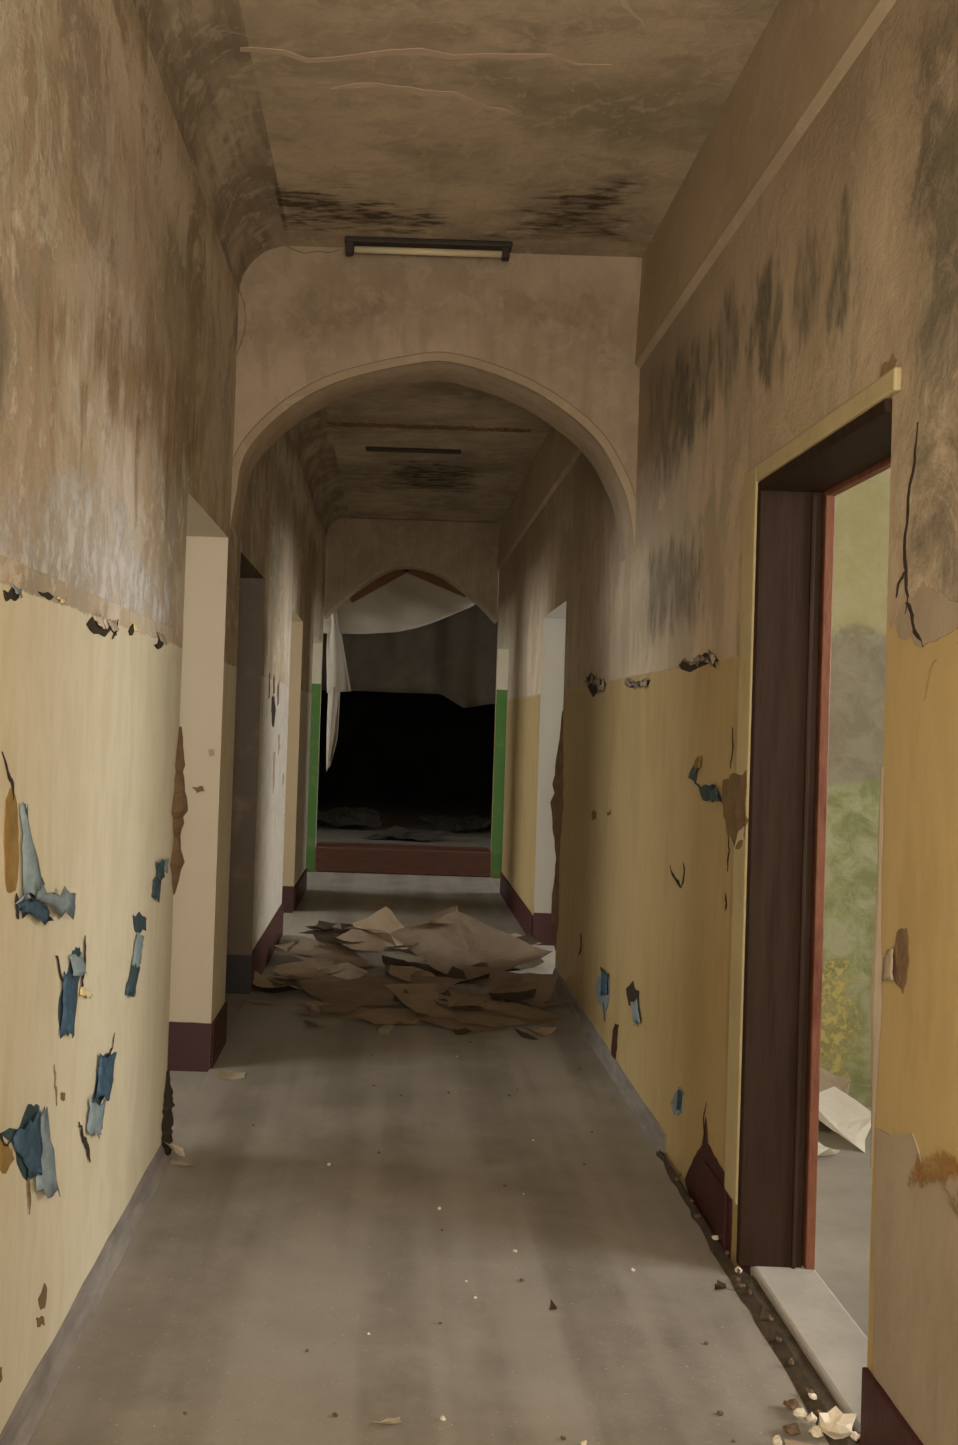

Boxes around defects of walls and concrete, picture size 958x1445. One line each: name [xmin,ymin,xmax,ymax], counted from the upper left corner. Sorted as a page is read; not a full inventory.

leakage [276,191,443,233]
leakage [524,182,633,235]
leakage [656,246,846,469]
leakage [0,330,197,624]
crack [896,422,937,701]
peeling [2,752,76,925]
flaking render [152,727,204,902]
peeling [56,935,93,1039]
peeling [126,912,147,998]
peeling [0,1092,65,1215]
peeling [79,1033,117,1163]
peeling [870,767,958,1445]